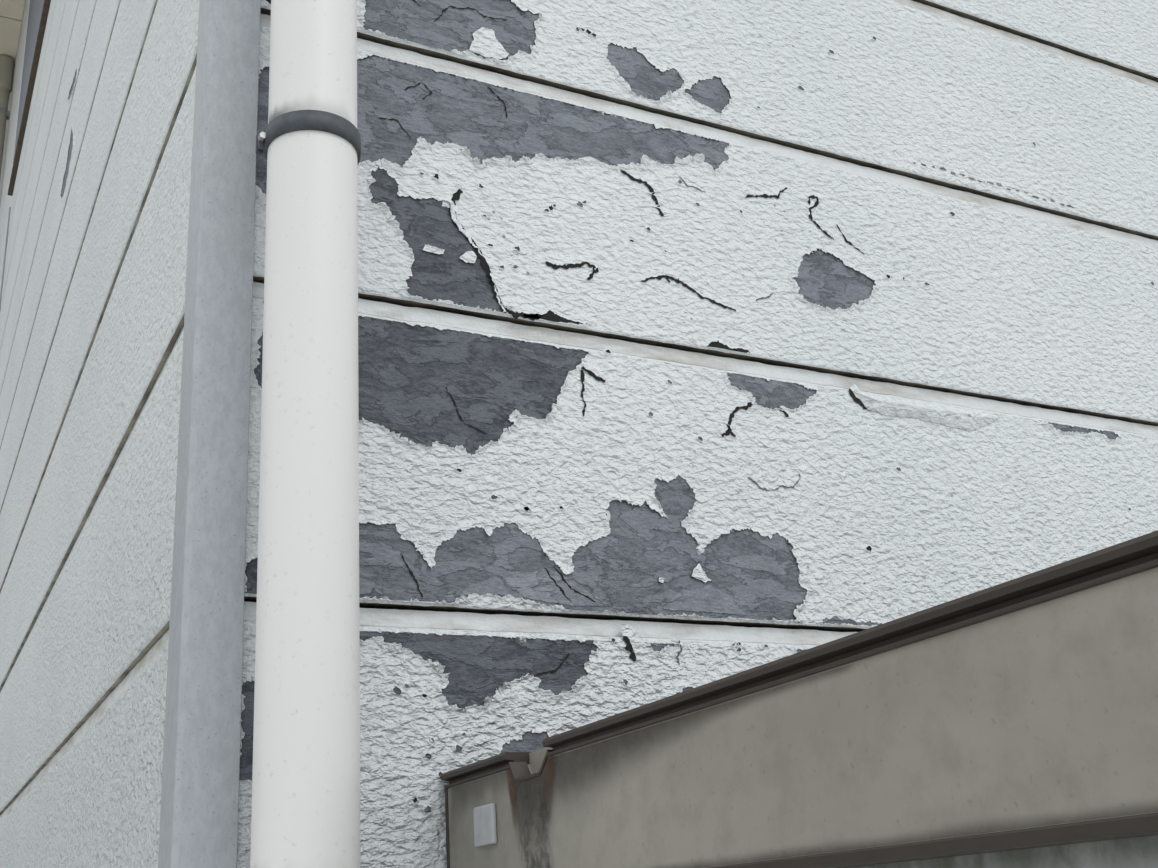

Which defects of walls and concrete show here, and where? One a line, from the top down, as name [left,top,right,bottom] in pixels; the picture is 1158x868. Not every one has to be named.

peeling [574,26,734,119]
peeling [357,52,731,317]
crack [744,185,864,254]
crack [546,255,601,280]
crack [640,270,773,311]
peeling [787,244,906,314]
peeling [358,315,612,475]
crack [581,362,608,416]
crack [718,396,790,437]
peeling [359,471,809,623]
peeling [360,630,617,714]
water stain [514,707,713,868]